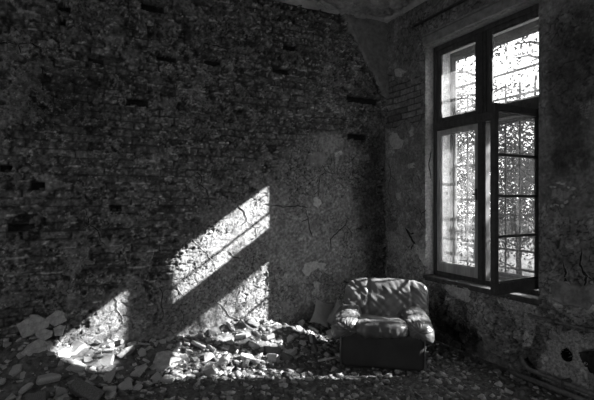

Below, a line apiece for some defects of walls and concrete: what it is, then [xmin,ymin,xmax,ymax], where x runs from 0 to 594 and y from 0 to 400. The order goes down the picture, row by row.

spalling [385,68,425,150]
peeling [319,134,366,172]
crack [271,165,335,237]
crack [405,208,426,250]
spalling [302,261,327,278]
crack [562,251,593,286]
crack [109,297,123,324]
spalling [538,330,594,396]